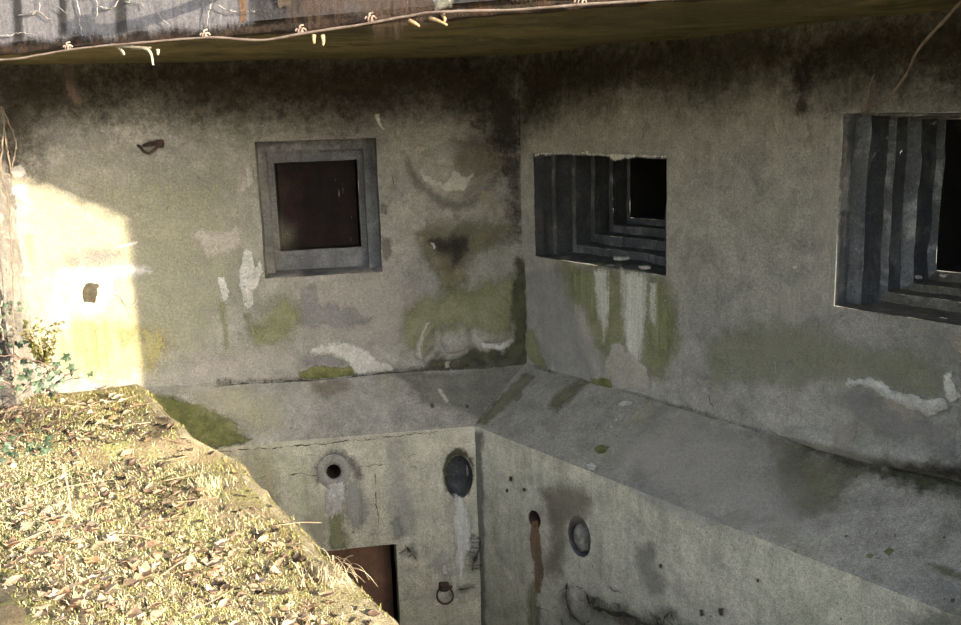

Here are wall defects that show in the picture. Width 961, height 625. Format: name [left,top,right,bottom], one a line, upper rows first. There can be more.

leakage [0,11,961,238]
peeling [47,264,153,325]
leakage [28,181,246,359]
peeling [194,226,264,309]
peeling [186,341,393,384]
peeling [301,287,372,329]
leakage [570,268,673,373]
leakage [622,421,961,520]
corrosion [528,520,544,625]
crack [540,583,675,625]